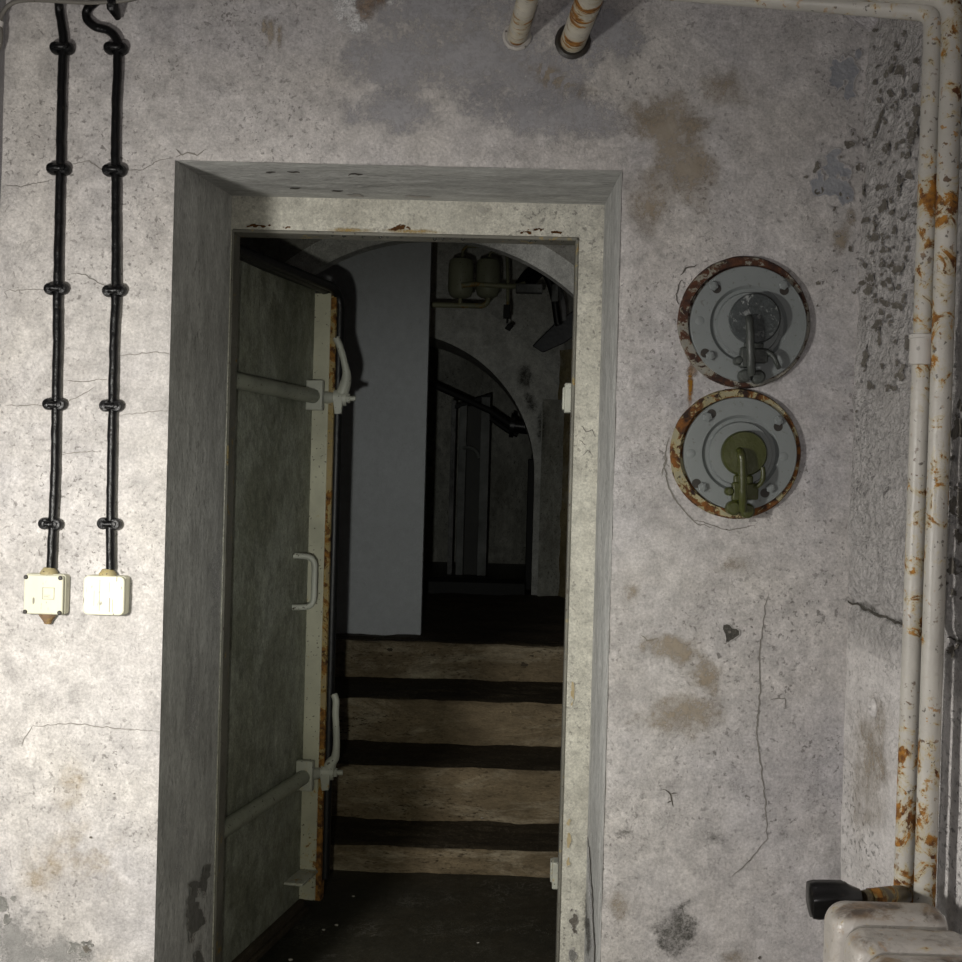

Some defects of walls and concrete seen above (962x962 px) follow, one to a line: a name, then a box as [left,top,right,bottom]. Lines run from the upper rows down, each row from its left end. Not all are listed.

water stain [333,0,645,138]
peeling [803,28,921,392]
water stain [641,635,717,693]
crack [848,601,903,625]
crack [733,596,786,875]
crack [587,838,595,962]
water stain [654,901,696,955]